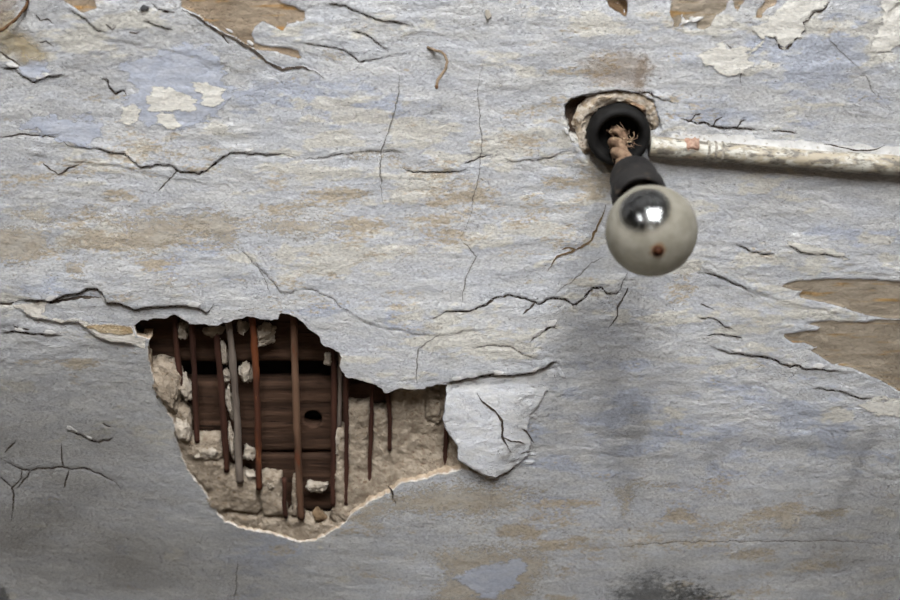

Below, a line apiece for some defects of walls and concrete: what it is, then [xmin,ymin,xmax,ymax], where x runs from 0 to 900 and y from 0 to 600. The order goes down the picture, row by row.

peeling [181,0,305,58]
crack [312,3,411,62]
peeling [670,0,744,29]
peeling [696,0,829,76]
peeling [118,41,266,134]
spalling [564,90,659,162]
crack [628,92,798,134]
crack [0,62,628,385]
crack [701,304,876,400]
peeling [783,278,900,417]
spalling [14,301,553,543]
crack [0,423,121,520]